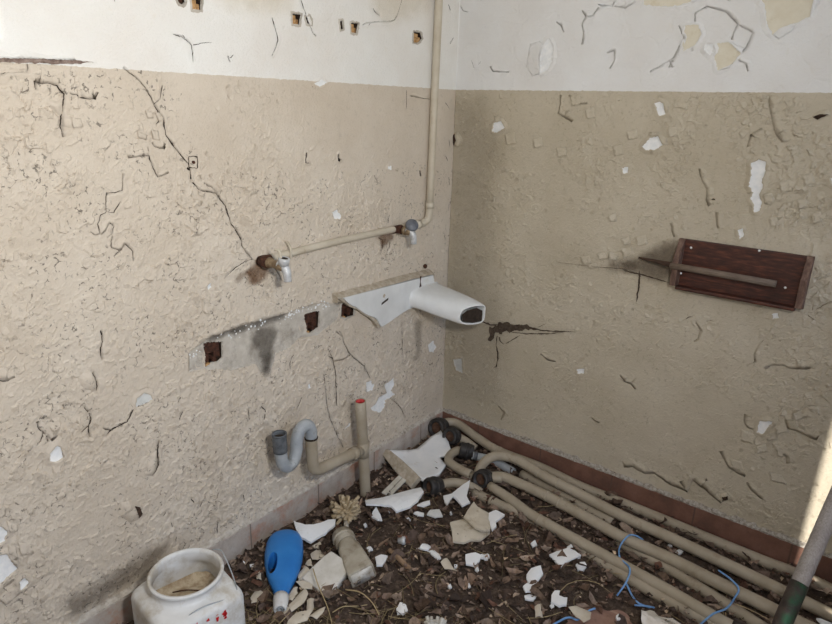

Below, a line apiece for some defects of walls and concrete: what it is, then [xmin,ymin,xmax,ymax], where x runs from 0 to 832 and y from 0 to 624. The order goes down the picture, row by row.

crack [557,0,635,45]
crack [650,0,762,76]
peeling [752,0,820,40]
crack [0,64,99,137]
crack [88,62,256,279]
peeling [638,132,668,155]
peeling [743,155,775,217]
flaking render [189,298,381,374]
crack [81,327,152,441]
peeling [364,375,397,415]
crack [35,419,57,448]
peeling [0,517,34,593]